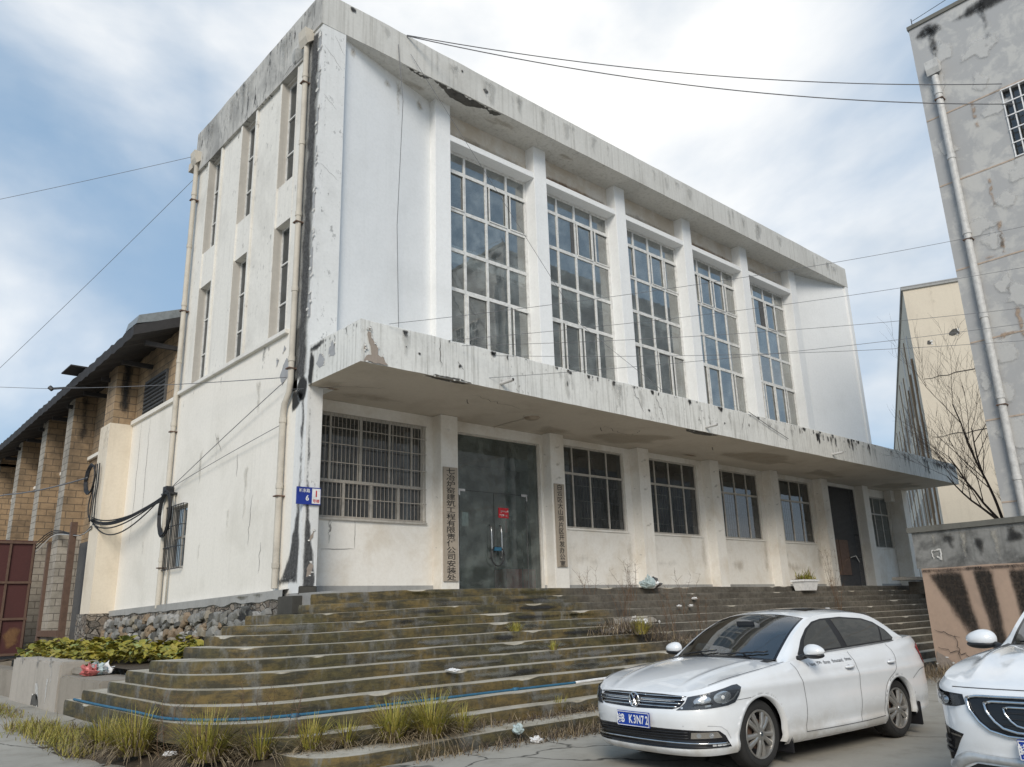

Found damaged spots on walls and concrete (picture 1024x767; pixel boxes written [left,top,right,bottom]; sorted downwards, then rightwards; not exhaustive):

leakage [959,0,1001,18]
leakage [917,25,938,50]
peeling [931,35,998,92]
peeling [971,99,1010,125]
peeling [985,272,1024,363]
peeling [316,341,335,368]
peeling [364,326,388,365]
leakage [782,422,870,450]
peeling [996,417,1024,464]
leakage [279,504,314,586]
leakage [923,564,1024,644]